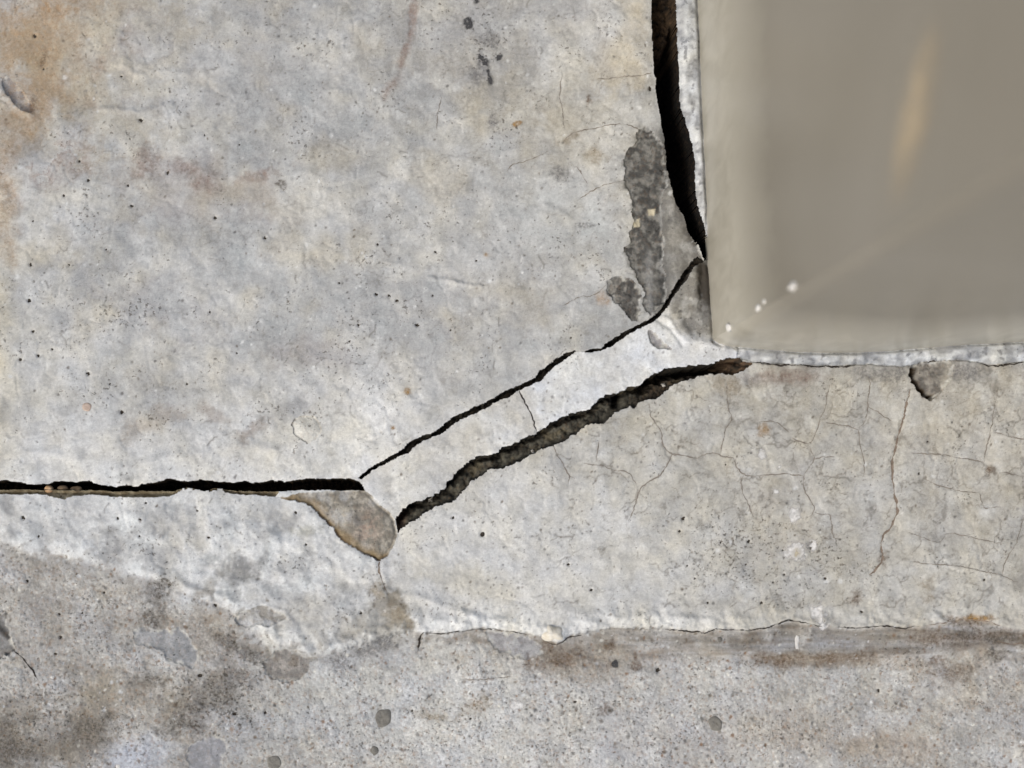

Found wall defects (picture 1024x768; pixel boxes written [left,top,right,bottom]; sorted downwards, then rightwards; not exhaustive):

crack [0,0,1024,582]
spalling [606,126,669,321]
spalling [908,360,954,401]
spalling [280,489,398,561]